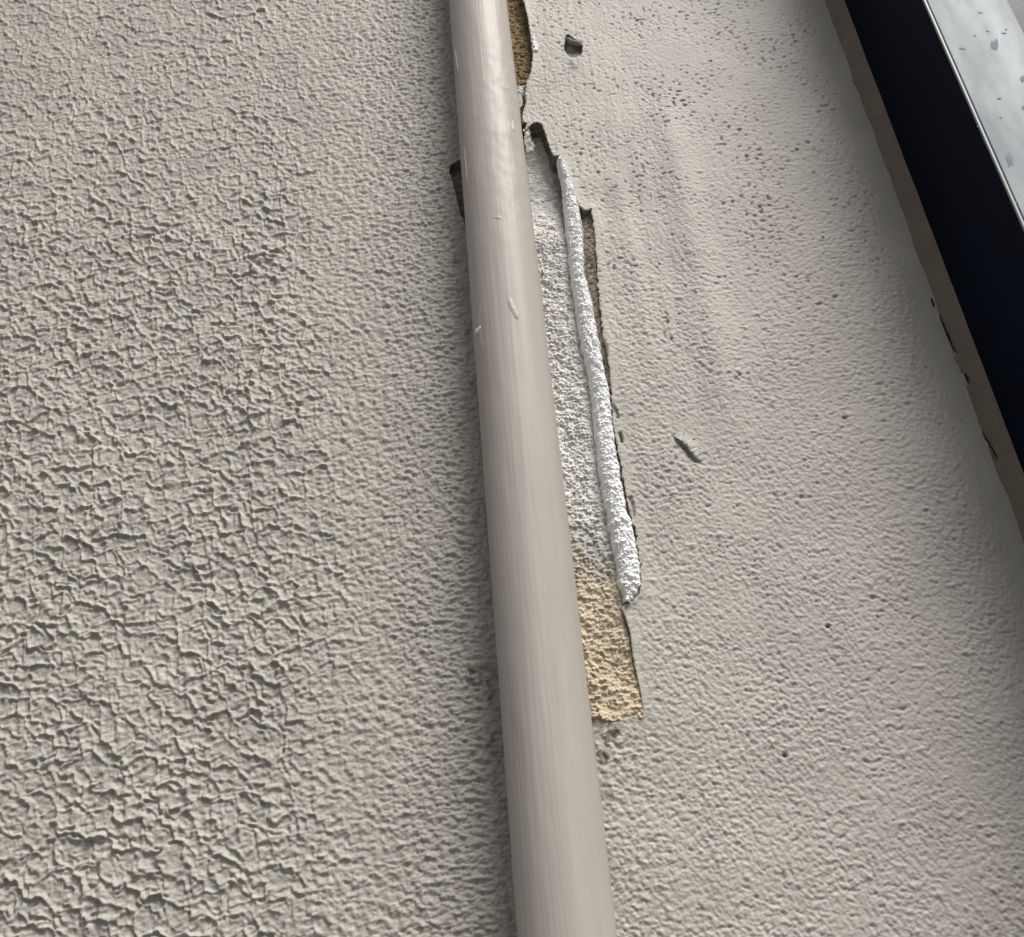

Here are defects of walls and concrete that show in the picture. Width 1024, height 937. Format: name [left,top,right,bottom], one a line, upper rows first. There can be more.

spalling [507,0,540,97]
peeling [565,37,582,58]
spalling [445,157,466,230]
spalling [523,120,651,728]